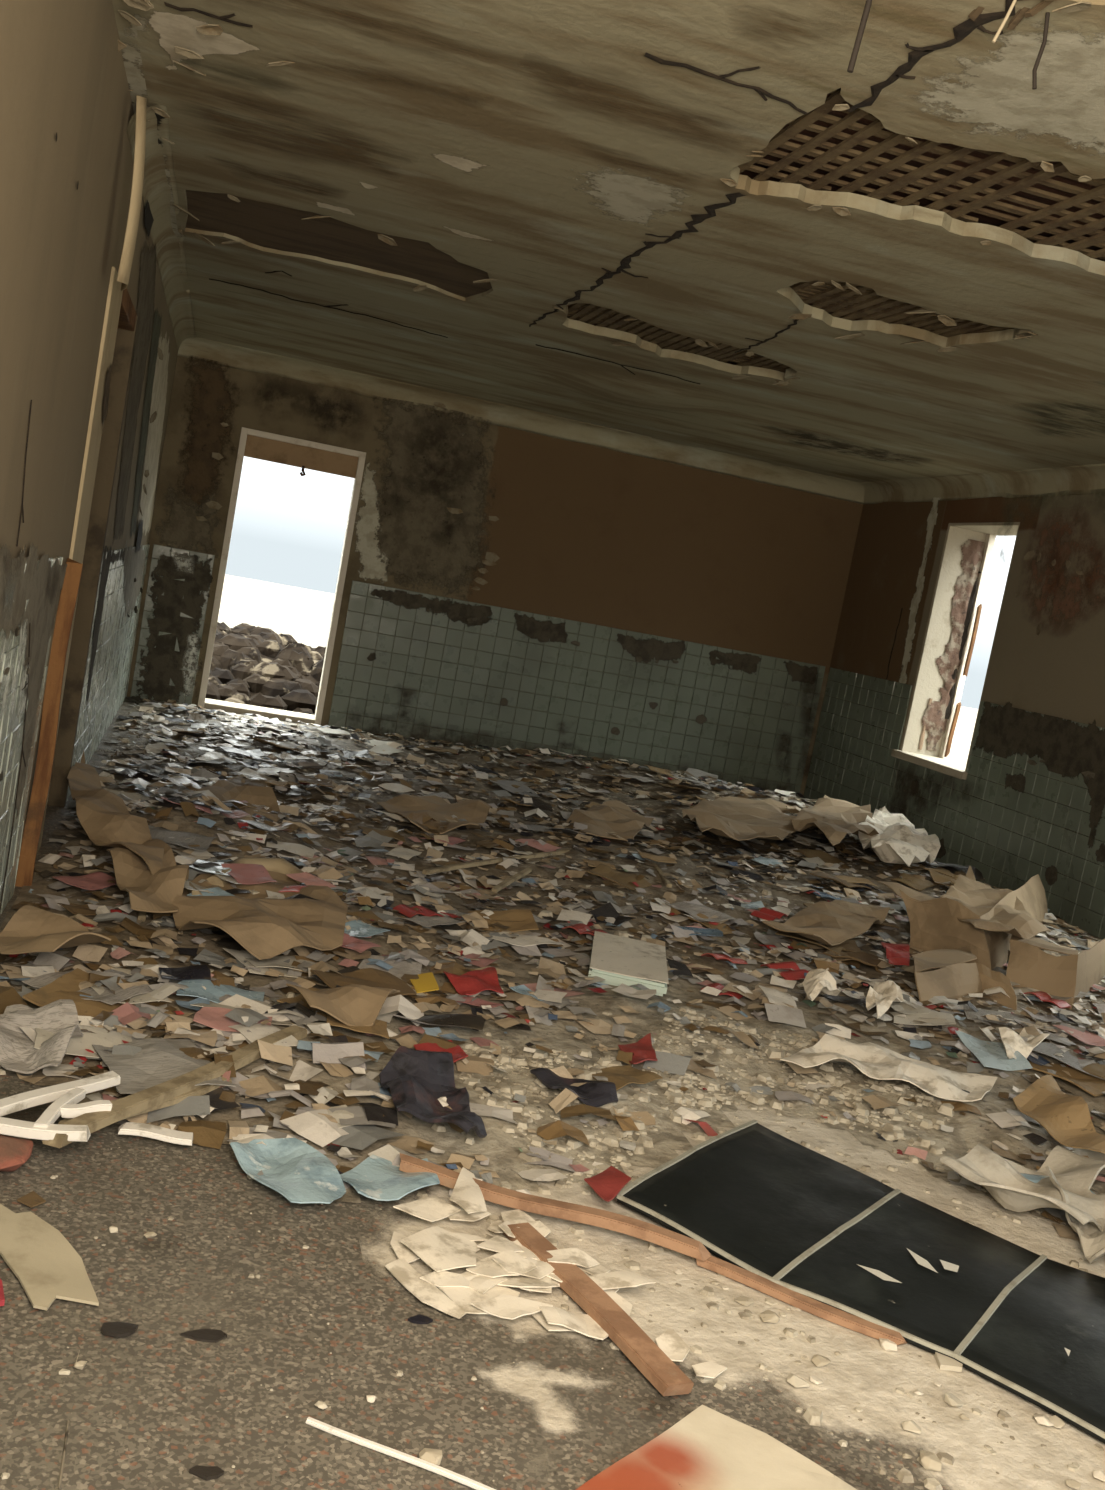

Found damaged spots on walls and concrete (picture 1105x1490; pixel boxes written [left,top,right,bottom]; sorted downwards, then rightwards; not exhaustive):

peeling [117,0,294,118]
crack [644,53,807,115]
spalling [720,0,1105,262]
crack [847,0,1021,112]
peeling [572,167,690,227]
crack [529,193,746,384]
spalling [553,303,800,386]
crack [734,319,799,353]
spalling [788,280,1038,352]
spalling [87,137,508,708]
peeling [0,543,67,817]
water stain [186,637,196,690]